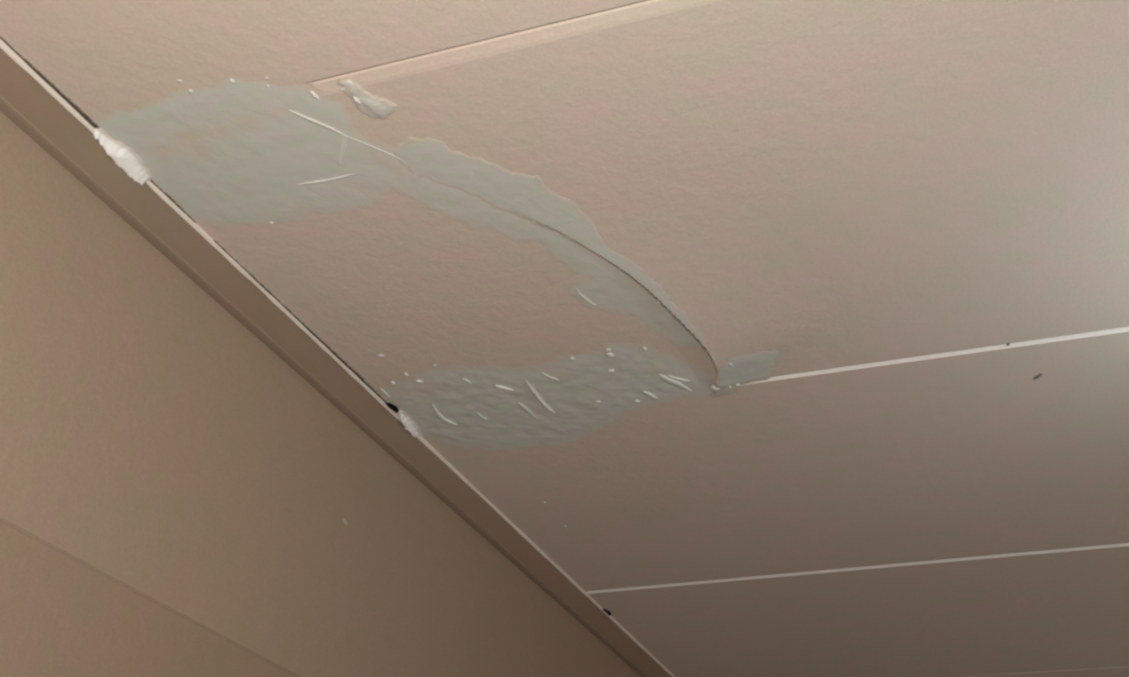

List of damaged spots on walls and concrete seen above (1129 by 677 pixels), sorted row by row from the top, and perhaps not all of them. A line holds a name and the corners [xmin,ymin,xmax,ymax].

peeling [336,78,399,120]